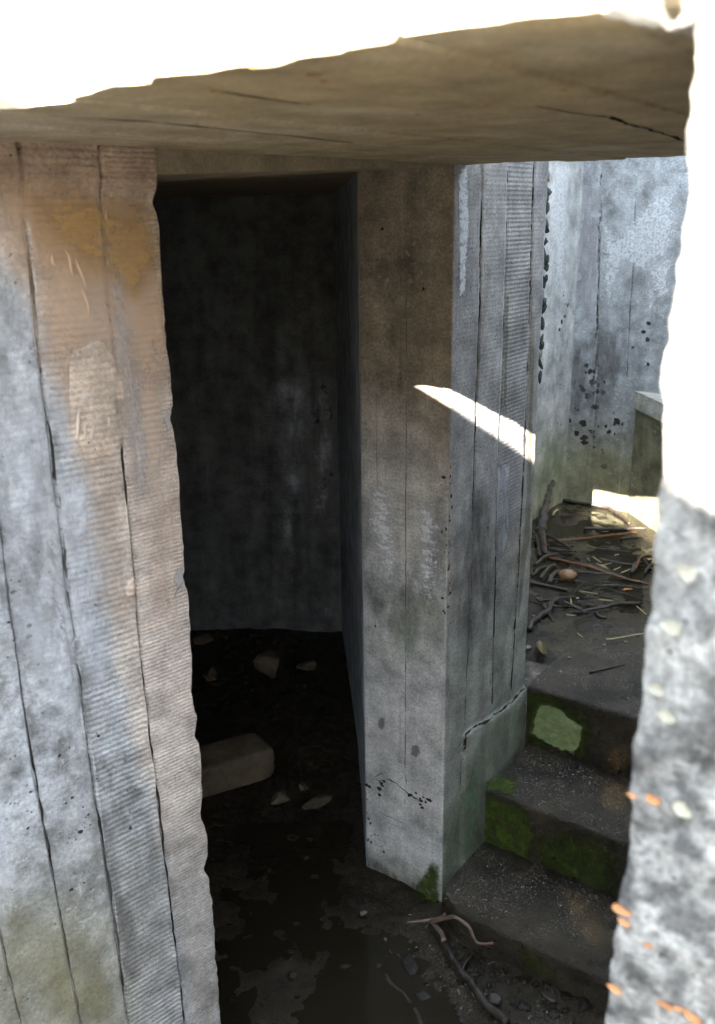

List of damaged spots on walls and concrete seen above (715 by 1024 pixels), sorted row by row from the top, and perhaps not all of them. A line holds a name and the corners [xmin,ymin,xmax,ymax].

crack [536,106,684,141]
crack [477,164,534,359]
crack [460,359,528,792]
peeling [532,705,582,752]